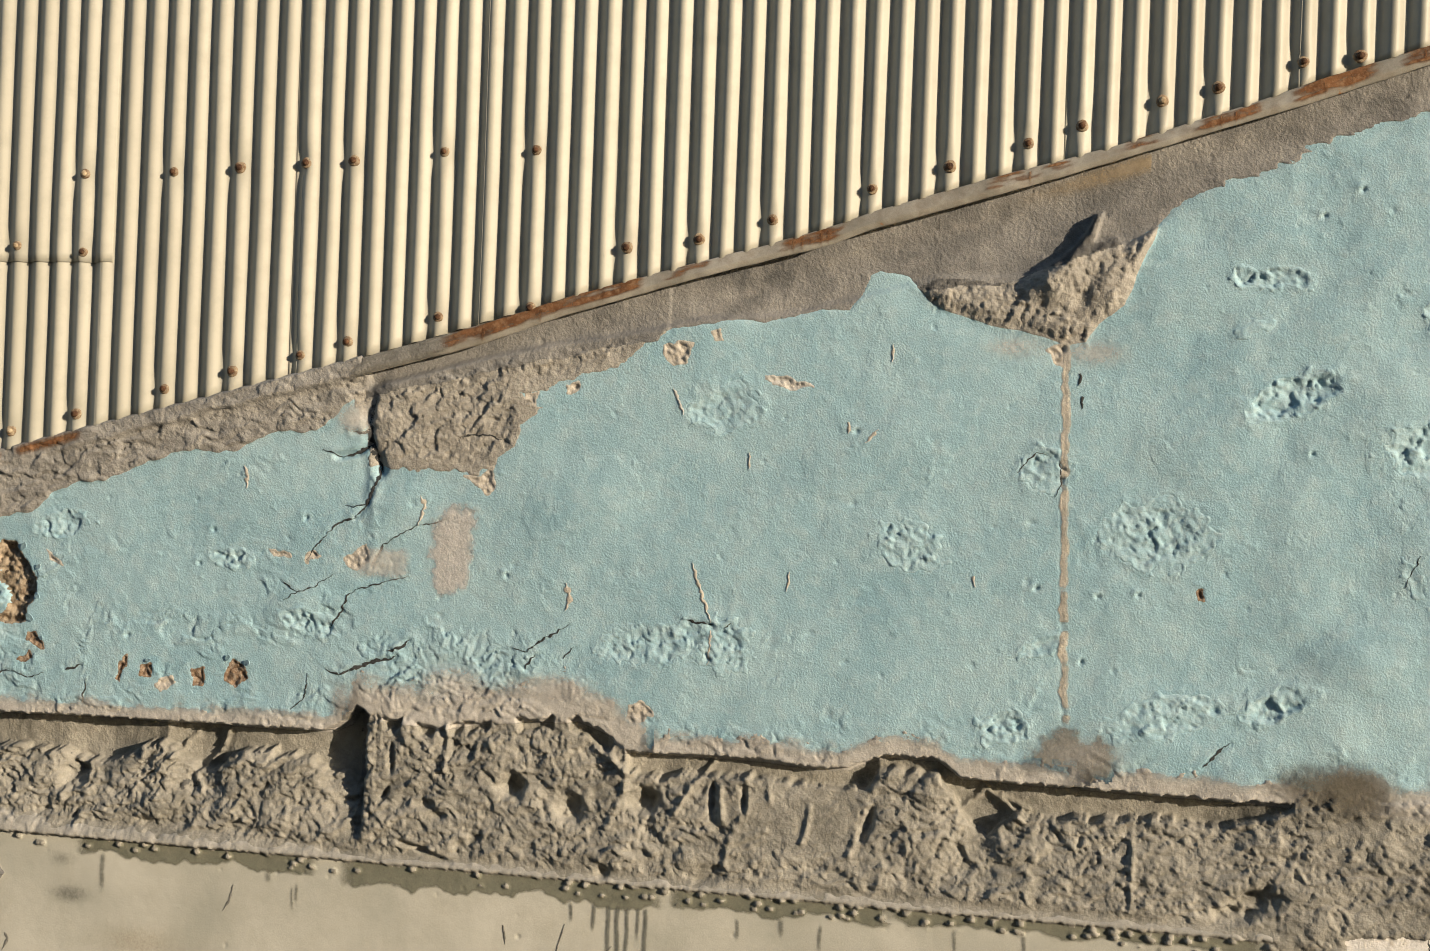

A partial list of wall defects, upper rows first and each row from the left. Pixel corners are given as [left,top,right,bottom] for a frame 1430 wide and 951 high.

corrosion [1199,103,1261,129]
corrosion [1294,63,1375,101]
corrosion [784,228,842,247]
corrosion [442,278,642,347]
flaking render [343,65,1430,496]
crack [282,400,442,628]
crack [1017,336,1084,722]
spalling [1088,495,1223,578]
spalling [0,508,100,662]
peeling [115,654,205,692]
crack [291,640,409,709]
hole [590,611,757,678]